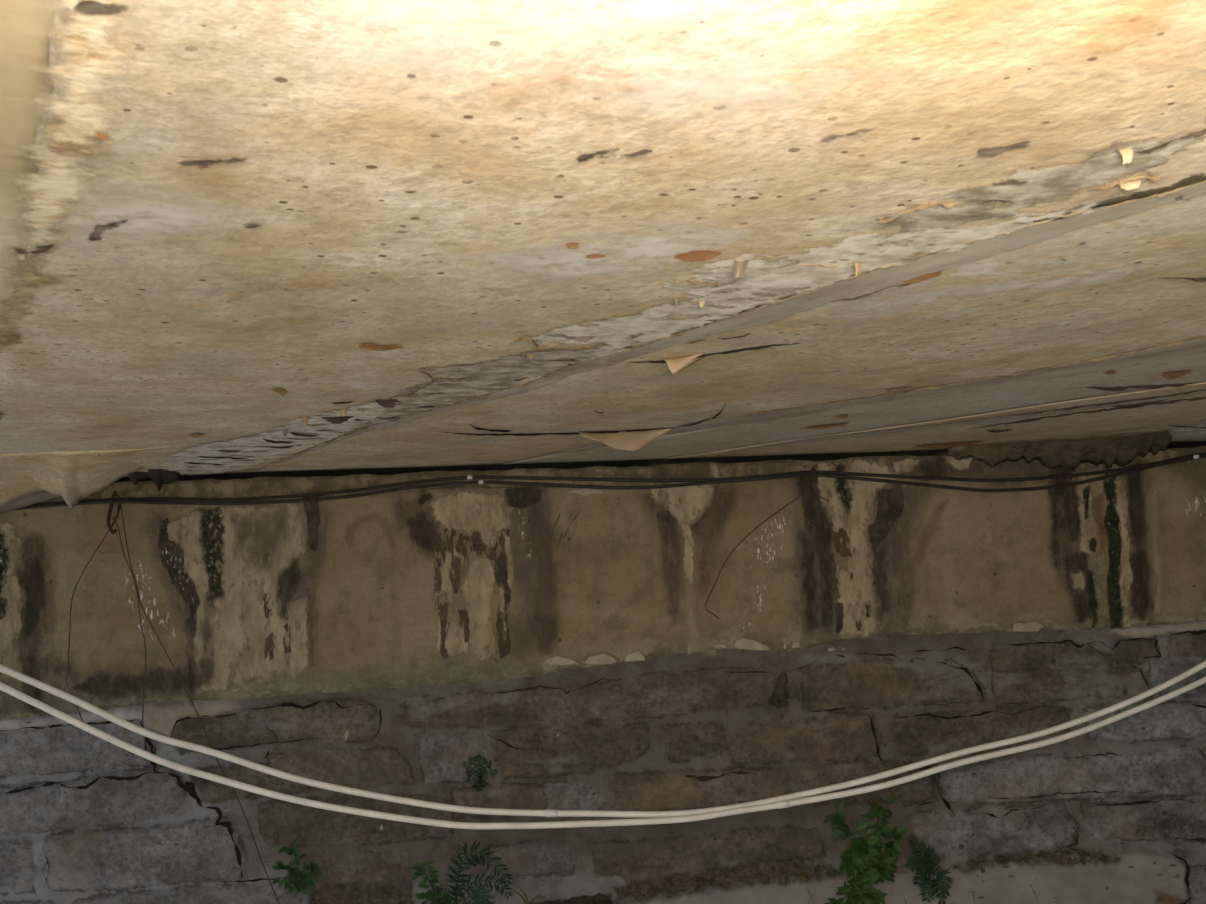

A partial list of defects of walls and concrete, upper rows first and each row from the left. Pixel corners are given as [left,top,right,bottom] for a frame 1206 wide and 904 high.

spalling [0,0,132,349]
peeling [0,129,1206,513]
crack [972,382,1206,433]
crack [1158,275,1206,283]
water stain [0,487,556,712]
water stain [650,463,731,650]
water stain [797,455,1163,638]